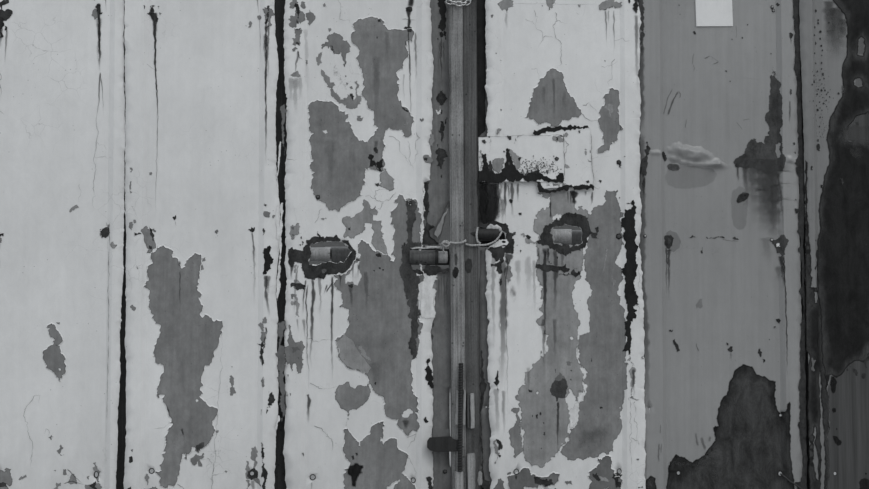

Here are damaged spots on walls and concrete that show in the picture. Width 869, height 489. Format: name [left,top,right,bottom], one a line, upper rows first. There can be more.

rust [0,0,13,38]
rust [92,0,106,59]
rust [143,5,162,108]
peeling [524,67,583,142]
peeling [585,87,624,162]
peeling [42,322,67,382]
peeling [129,220,224,489]
peeling [263,203,305,376]
rust [288,233,360,342]
peeling [289,0,438,489]
peeling [493,190,628,489]
rust [645,0,869,489]